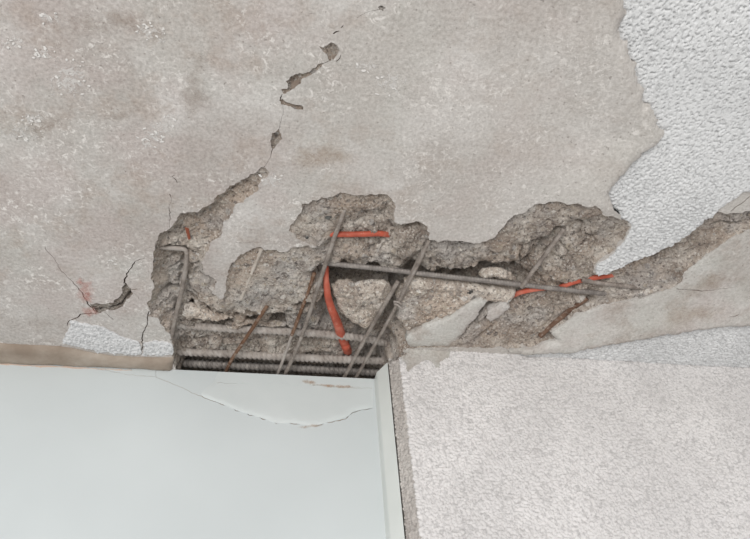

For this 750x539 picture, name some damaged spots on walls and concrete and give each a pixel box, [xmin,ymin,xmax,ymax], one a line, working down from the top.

crack [264,6,385,167]
spalling [62,0,750,379]
crack [45,248,110,325]